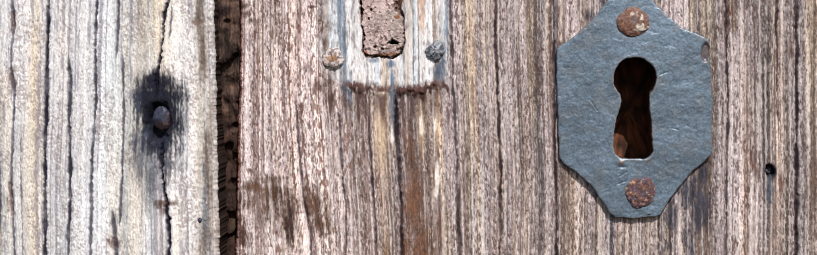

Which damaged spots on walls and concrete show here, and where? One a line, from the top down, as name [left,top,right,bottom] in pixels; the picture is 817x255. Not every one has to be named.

crack [156,2,170,95]
leakage [133,69,187,215]
crack [161,143,171,255]